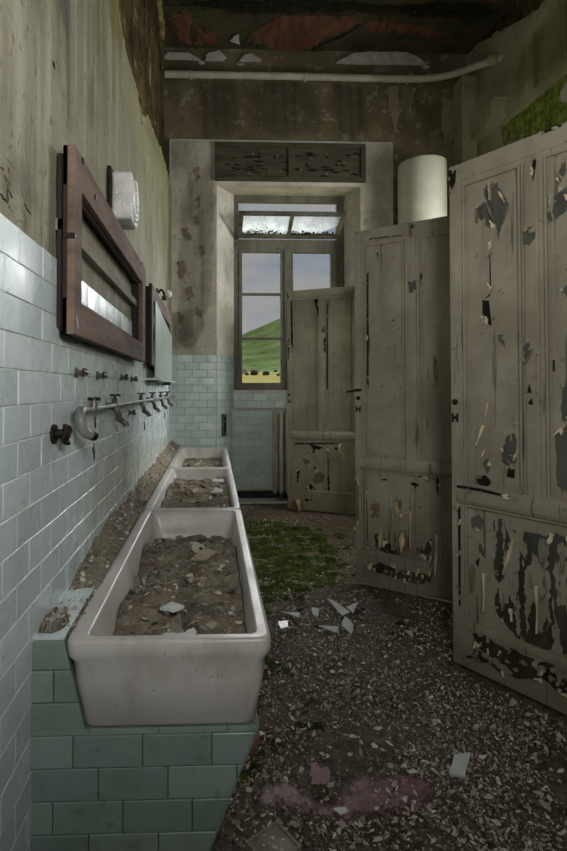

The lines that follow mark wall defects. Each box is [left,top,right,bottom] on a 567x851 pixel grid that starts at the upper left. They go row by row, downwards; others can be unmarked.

leakage [187,0,492,18]
flaking render [230,12,367,51]
flaking render [118,0,167,164]
flaking render [557,82,567,108]